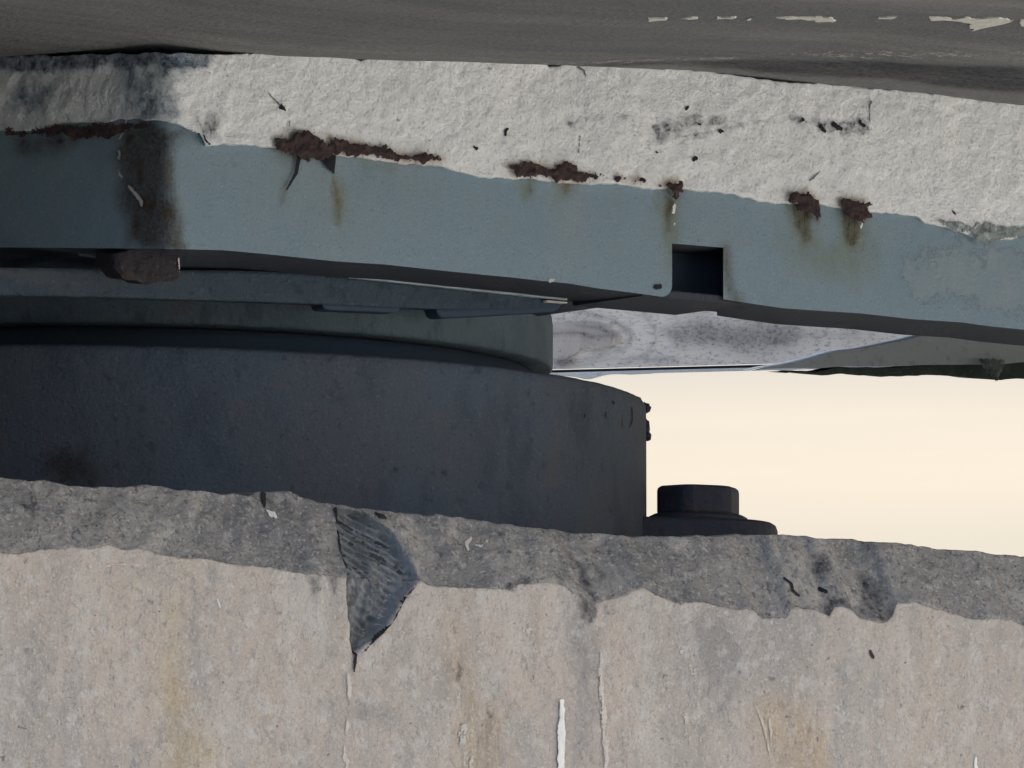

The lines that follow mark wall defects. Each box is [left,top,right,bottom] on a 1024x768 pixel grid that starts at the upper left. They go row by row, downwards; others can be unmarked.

rust [4,119,172,232]
rust [275,129,442,190]
rust [509,160,646,183]
rust [659,181,684,225]
rust [788,191,821,233]
rust [841,198,872,244]
spalling [333,505,419,672]